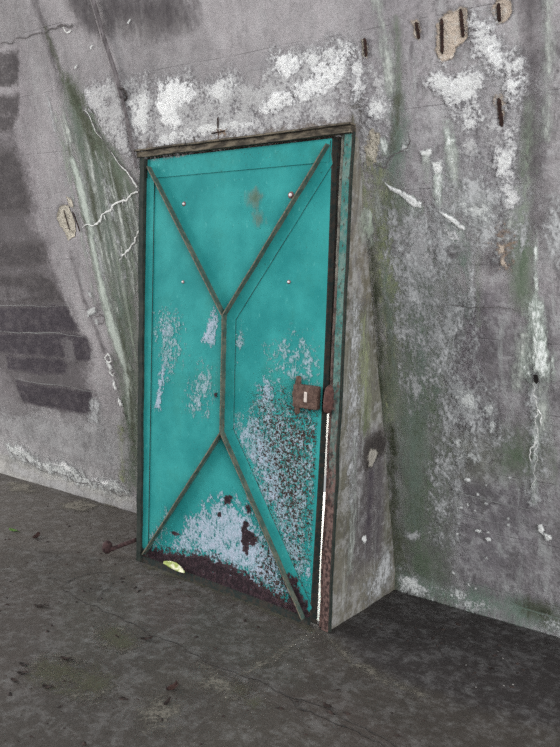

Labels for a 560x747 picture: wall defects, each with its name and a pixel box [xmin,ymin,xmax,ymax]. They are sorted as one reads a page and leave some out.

spalling [57,196,80,241]
damp [0,0,139,496]
crack [82,105,138,228]
crack [120,231,139,260]
damp [371,0,401,155]
peeling [422,0,536,181]
damp [530,0,555,91]
damp [345,95,560,598]